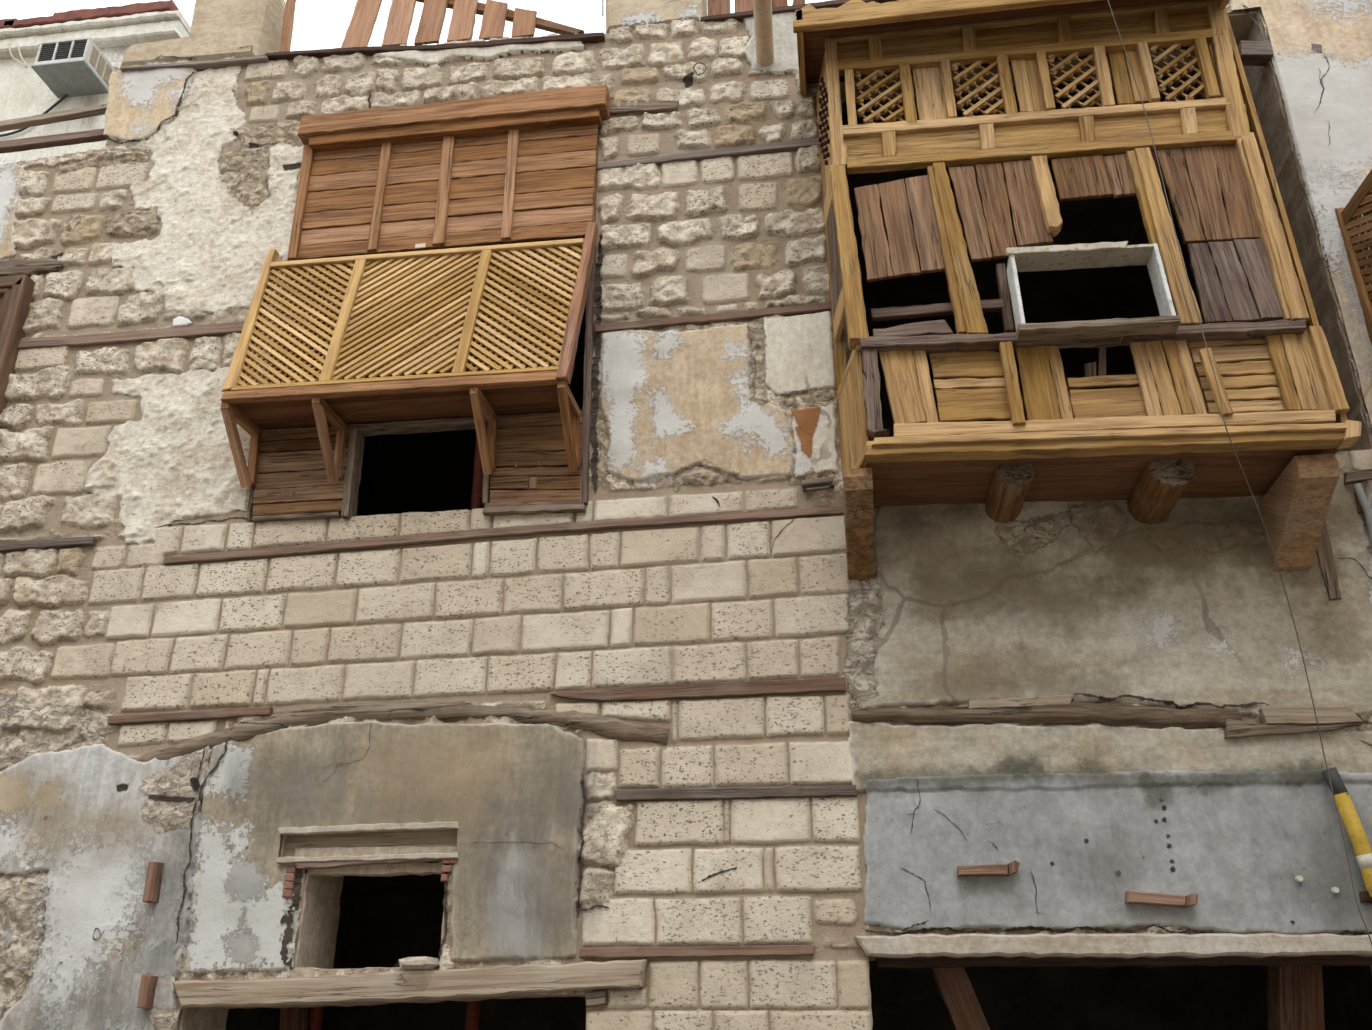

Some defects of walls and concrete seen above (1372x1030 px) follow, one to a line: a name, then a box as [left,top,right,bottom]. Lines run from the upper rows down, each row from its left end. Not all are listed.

peeling [0,157,63,260]
spalling [218,112,309,213]
peeling [592,317,836,492]
spalling [843,555,887,709]
peeling [0,694,301,1030]
crack [176,741,228,944]
crack [909,779,1000,850]
crack [862,866,1216,936]
crack [1329,928,1372,936]